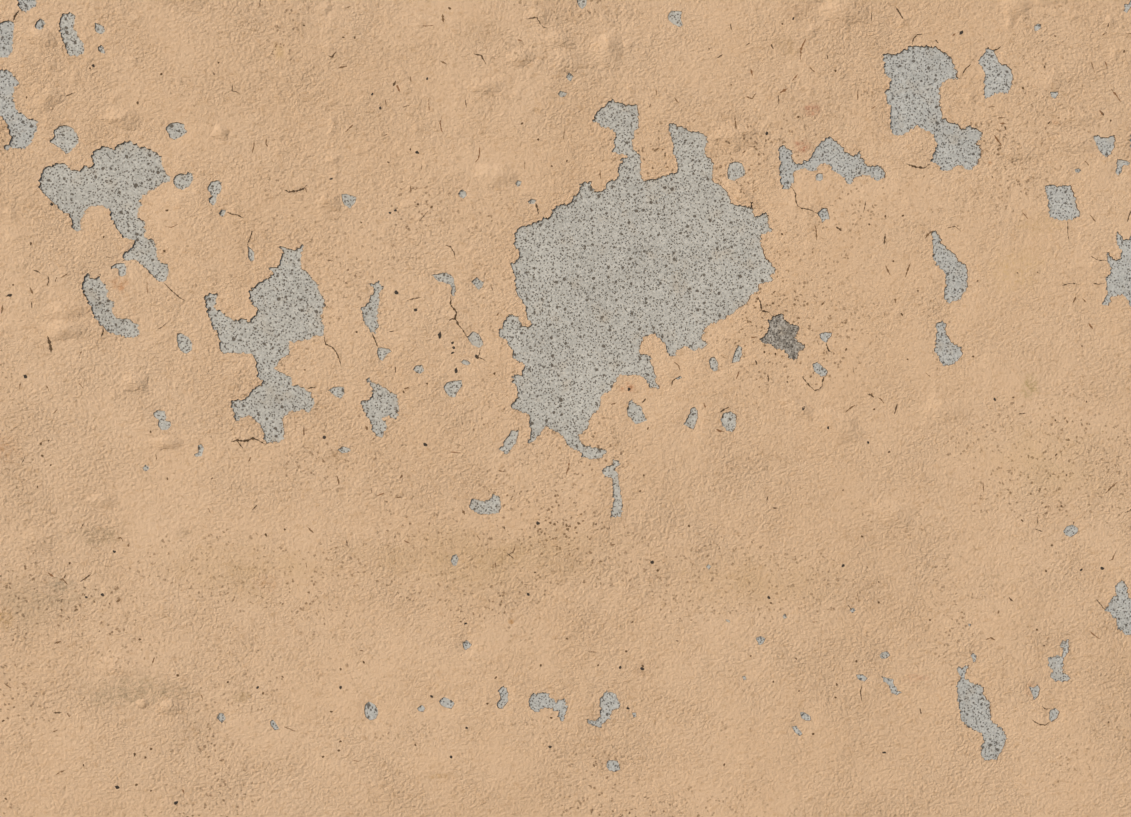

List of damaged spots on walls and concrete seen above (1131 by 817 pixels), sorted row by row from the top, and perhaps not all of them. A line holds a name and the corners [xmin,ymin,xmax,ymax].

peeling [17,0,105,57]
peeling [0,20,38,151]
peeling [883,46,982,171]
peeling [778,137,885,189]
peeling [39,123,193,338]
peeling [204,244,326,443]
peeling [499,99,775,517]
peeling [760,314,805,360]
peeling [931,231,968,303]
peeling [1102,232,1131,306]
peeling [360,377,399,437]
peeling [956,653,1007,760]